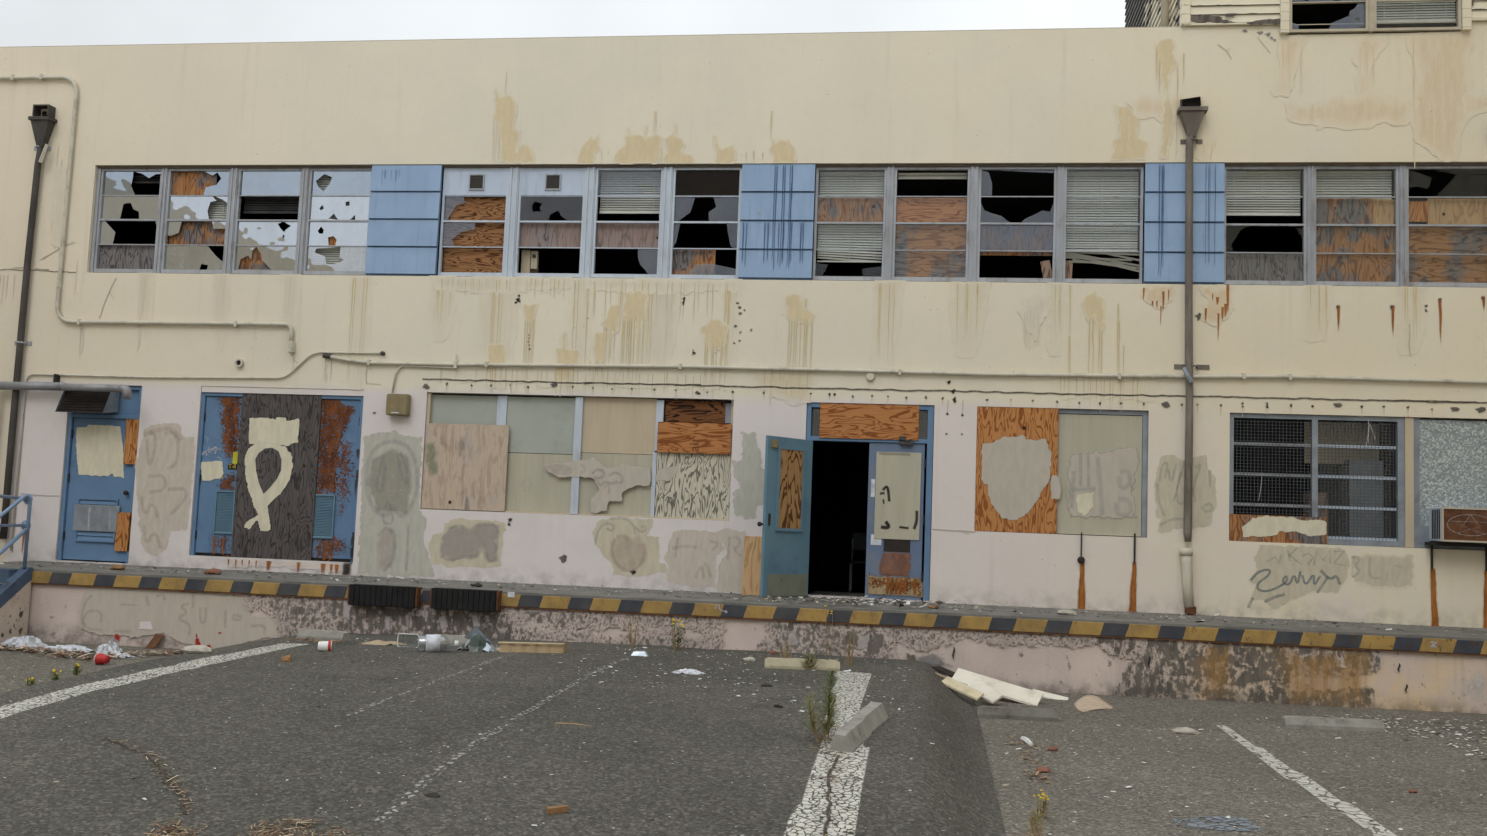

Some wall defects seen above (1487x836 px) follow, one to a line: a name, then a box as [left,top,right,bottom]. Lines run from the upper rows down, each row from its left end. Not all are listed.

water stain [492,71,535,164]
water stain [576,111,694,164]
water stain [713,111,797,164]
water stain [1110,37,1216,162]
rust [1140,284,1175,322]
rust [1198,284,1234,336]
water stain [427,275,853,406]